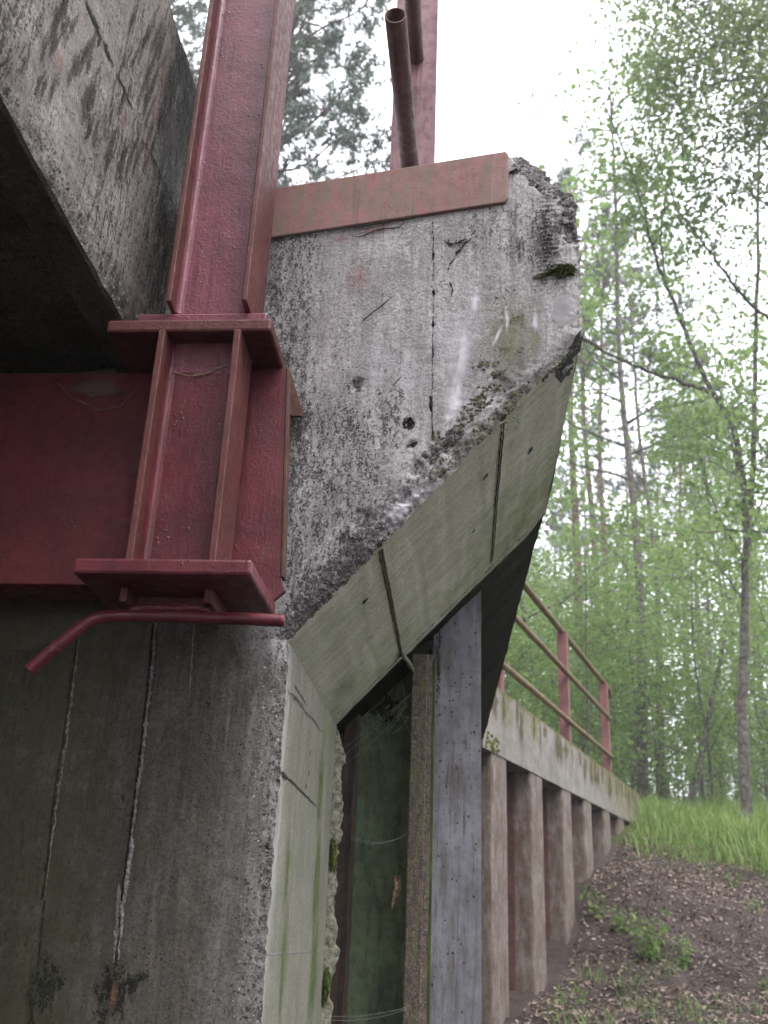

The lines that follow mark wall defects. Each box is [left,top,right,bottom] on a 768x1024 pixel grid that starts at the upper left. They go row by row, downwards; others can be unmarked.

damp [18,0,188,200]
spalling [509,156,580,244]
crack [271,215,472,437]